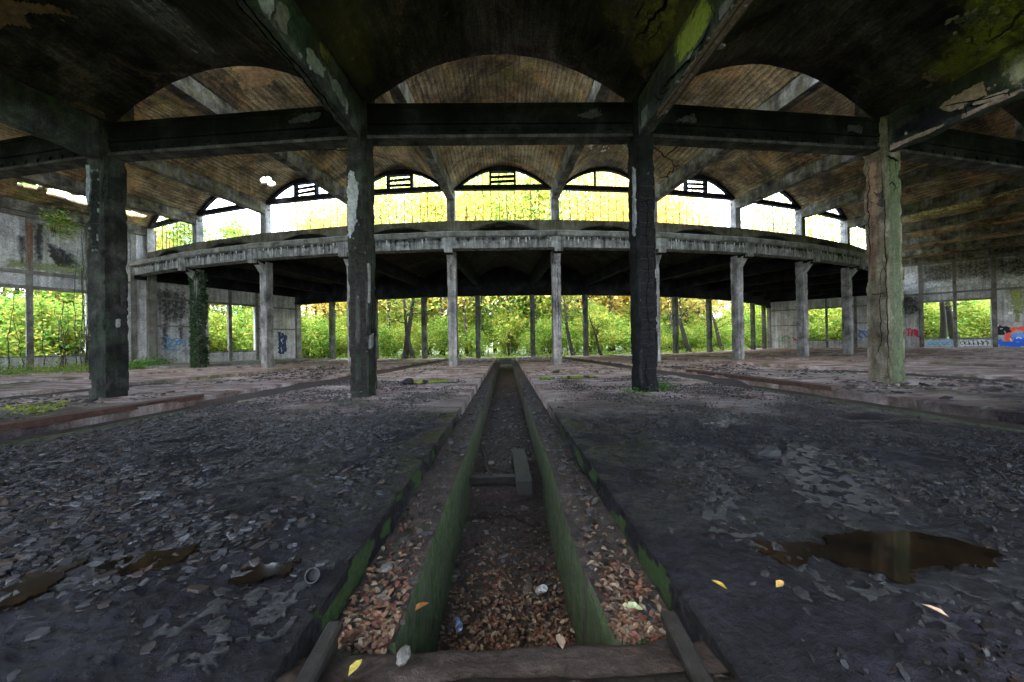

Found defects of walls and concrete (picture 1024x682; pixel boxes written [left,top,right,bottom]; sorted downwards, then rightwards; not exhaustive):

flaking render [0,0,78,29]
peeling [258,0,290,35]
crack [634,0,668,44]
damp [601,0,711,67]
damp [928,0,1024,83]
peeling [298,48,349,114]
flaking render [939,78,1024,119]
flaking render [890,124,944,151]
crack [867,155,900,382]
spalling [0,165,449,449]